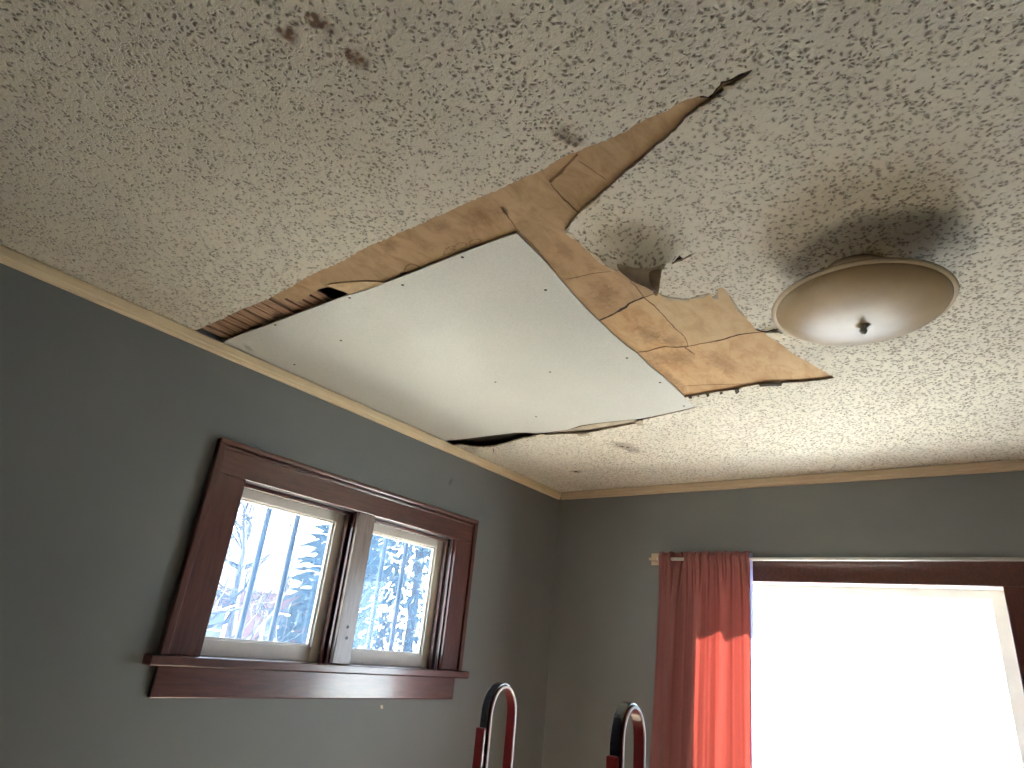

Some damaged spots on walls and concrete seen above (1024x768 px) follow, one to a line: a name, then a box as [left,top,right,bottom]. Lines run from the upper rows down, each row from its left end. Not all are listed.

leakage [306,13,333,34]
peeling [202,71,832,399]